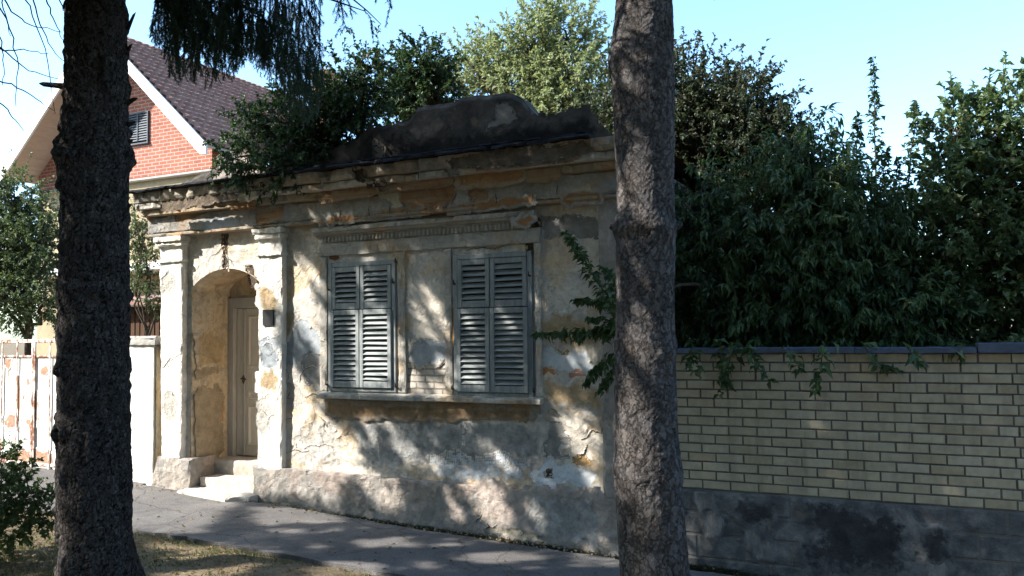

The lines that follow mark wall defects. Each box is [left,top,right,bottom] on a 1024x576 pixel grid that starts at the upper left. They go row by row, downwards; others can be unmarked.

flaking render [318,166,460,210]
flaking render [259,319,328,412]
flaking render [401,338,454,394]
flaking render [534,340,594,397]
crack [547,407,603,460]
water stain [690,490,958,576]